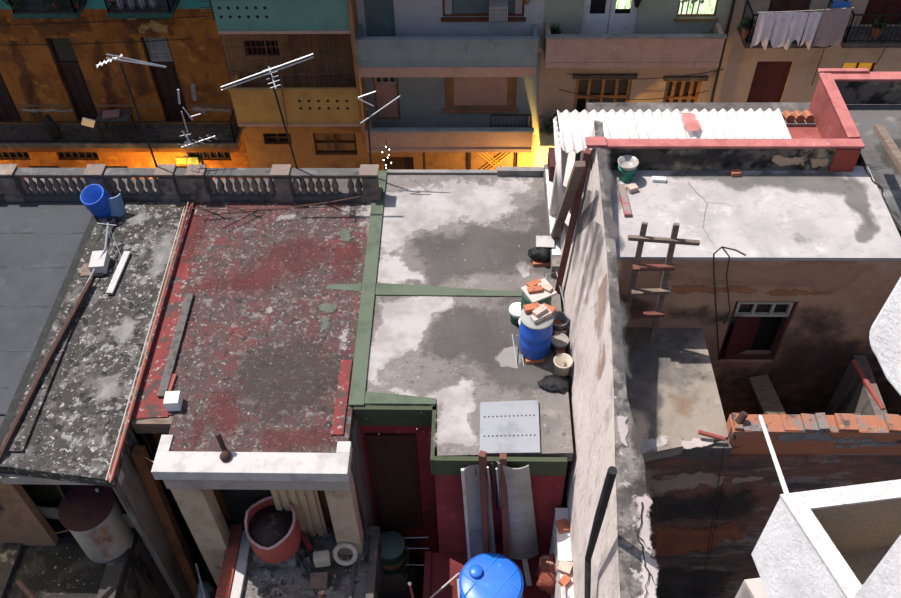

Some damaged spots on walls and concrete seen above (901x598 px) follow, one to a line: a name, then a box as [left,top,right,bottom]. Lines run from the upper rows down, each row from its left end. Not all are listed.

crack [688,182,730,248]
water stain [416,202,551,286]
water stain [734,317,901,416]
water stain [631,412,649,452]
spalling [772,431,898,449]
water stain [631,476,753,520]
water stain [655,568,733,598]